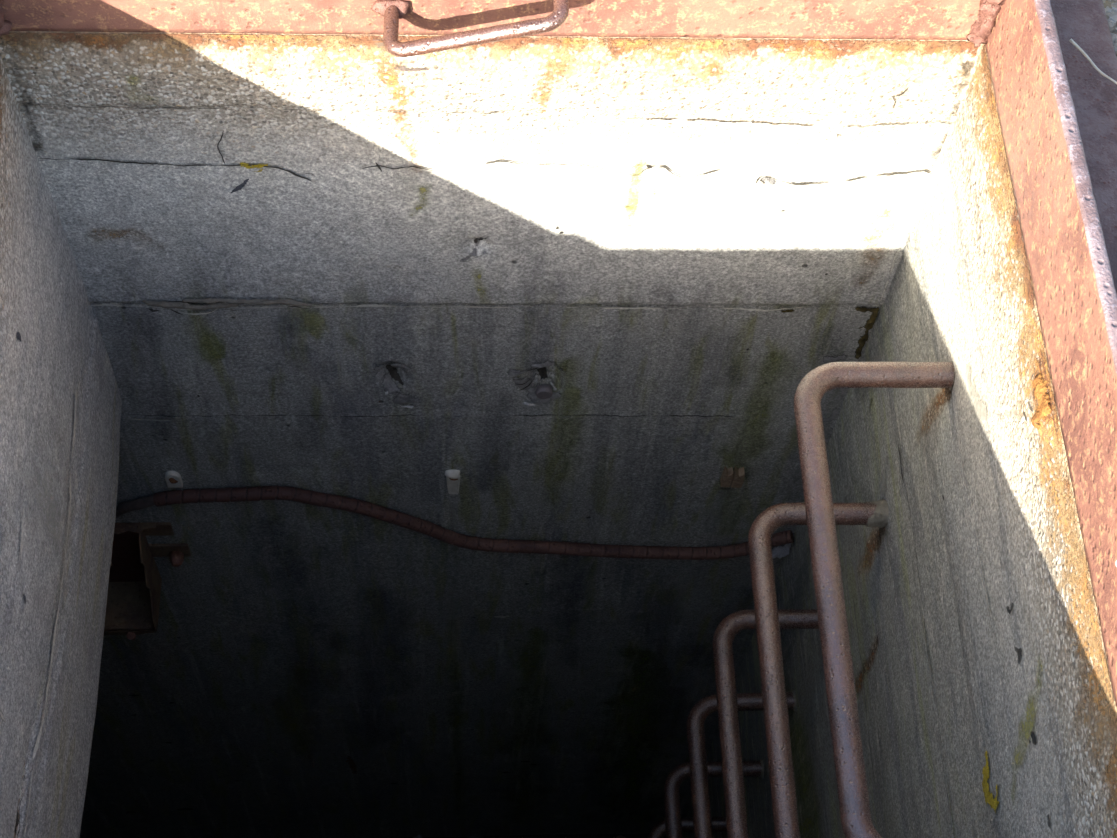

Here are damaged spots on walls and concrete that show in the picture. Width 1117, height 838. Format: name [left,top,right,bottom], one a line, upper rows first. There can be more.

corrosion [0,33,438,160]
crack [40,106,519,182]
crack [755,170,932,185]
spalling [460,237,487,262]
spalling [508,361,562,407]
corrosion [469,37,1117,814]